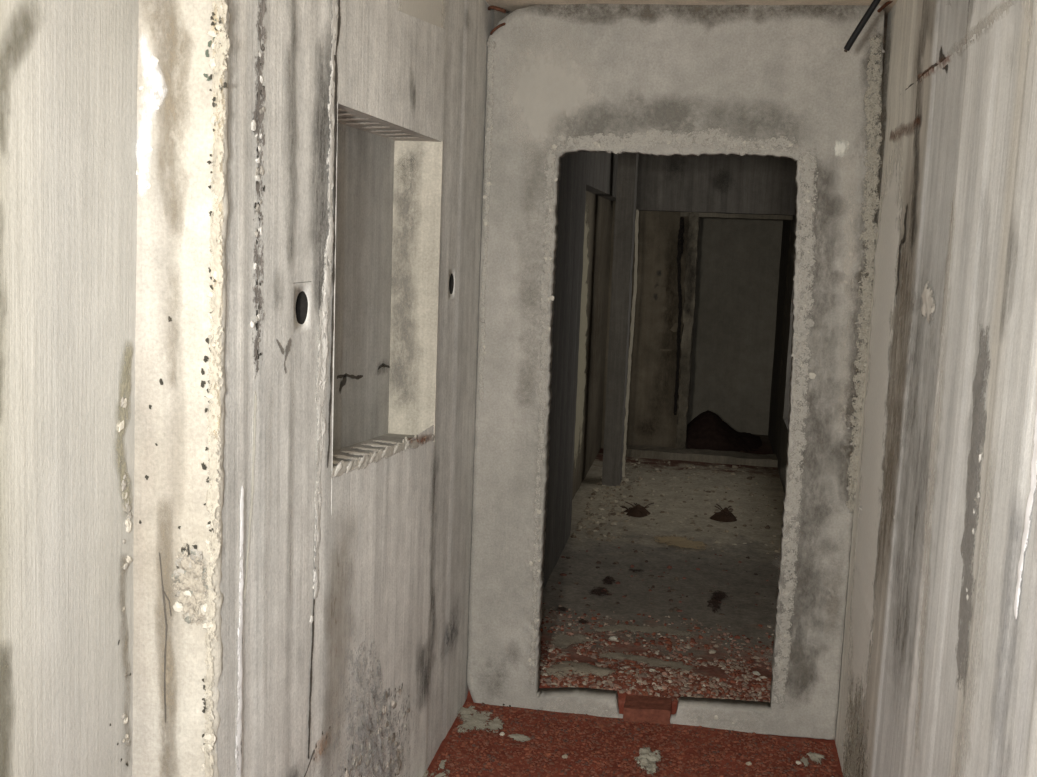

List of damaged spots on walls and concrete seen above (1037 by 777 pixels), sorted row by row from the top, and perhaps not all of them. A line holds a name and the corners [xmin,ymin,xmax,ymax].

water stain [0,12,32,145]
water stain [568,101,694,138]
water stain [868,36,888,224]
water stain [805,167,875,322]
spalling [171,0,230,777]
crack [276,339,291,374]
crack [294,0,390,777]
water stain [798,359,865,494]
water stain [773,555,817,690]
water stain [0,652,10,777]